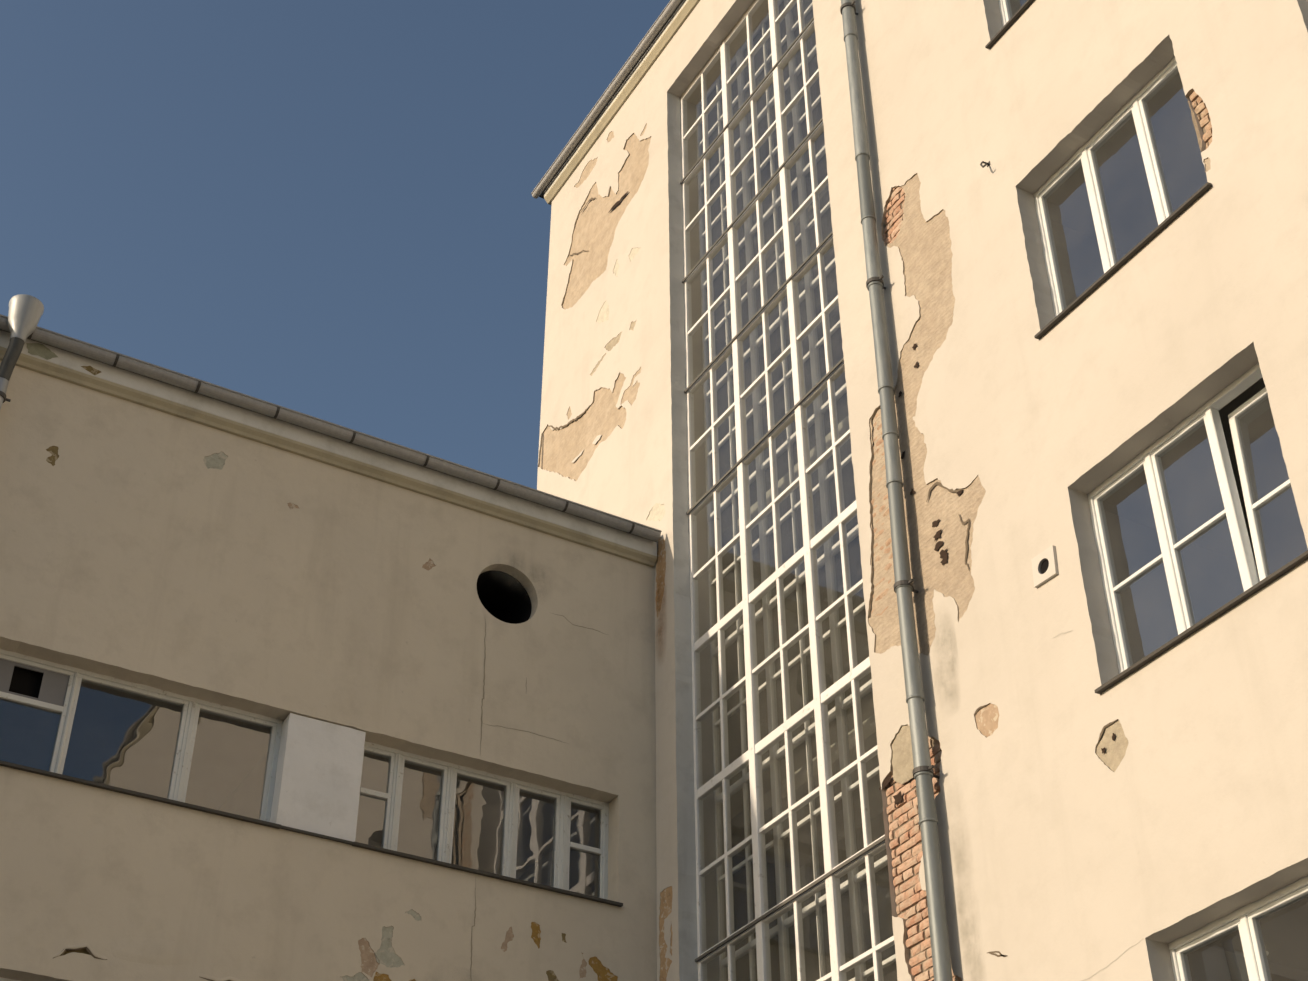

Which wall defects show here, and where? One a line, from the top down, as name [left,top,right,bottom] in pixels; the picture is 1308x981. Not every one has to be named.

flaking render [1186,88,1212,173]
flaking render [561,123,651,309]
flaking render [538,321,641,481]
flaking render [868,173,986,656]
flaking render [928,736,942,798]
flaking render [974,703,999,738]
flaking render [1095,719,1129,772]
flaking render [879,724,934,981]
peeling [339,926,416,981]
peeling [531,922,541,948]
peeling [579,952,618,981]
crack [1081,938,1144,981]